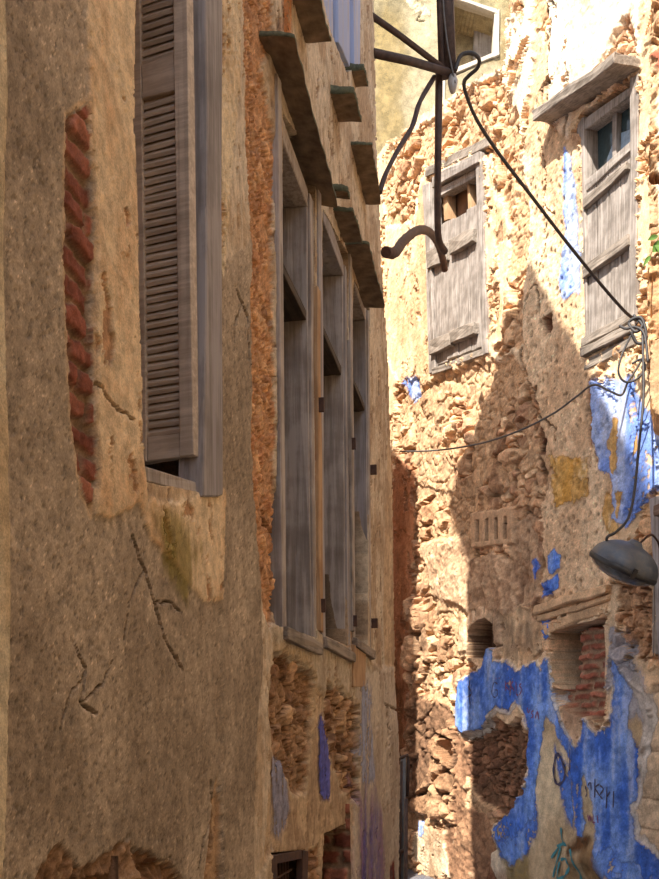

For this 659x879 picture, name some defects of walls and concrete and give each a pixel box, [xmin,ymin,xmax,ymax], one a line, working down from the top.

spalling [526,0,553,38]
spalling [586,3,642,74]
spalling [62,97,103,518]
spalling [242,0,362,836]
spalling [382,69,659,879]
crack [123,532,184,671]
crack [59,643,113,730]
spalling [29,827,185,879]
spalling [308,834,322,879]